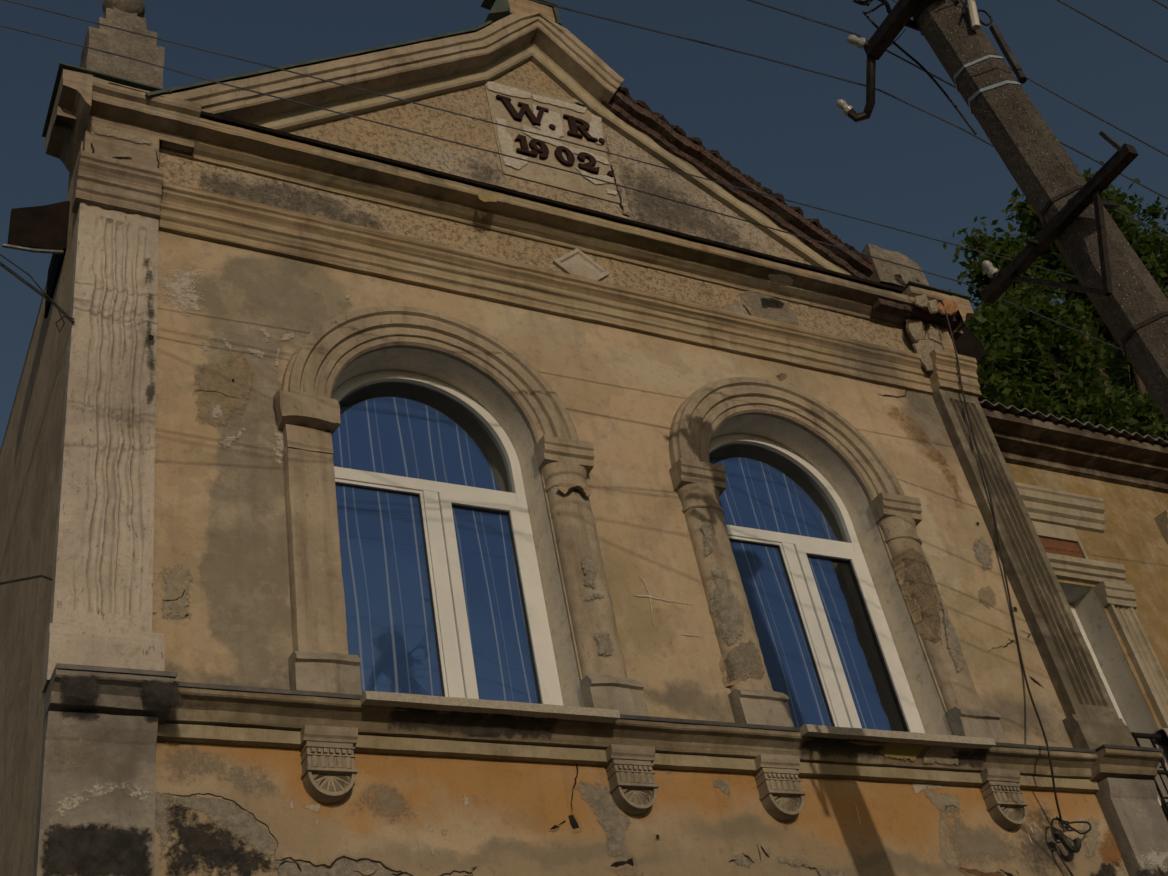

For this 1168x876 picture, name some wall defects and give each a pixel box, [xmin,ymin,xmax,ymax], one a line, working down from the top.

water stain [248,41,851,275]
flaking render [194,331,294,426]
flaking render [872,294,966,372]
flaking render [709,569,765,687]
flaking render [892,547,965,671]
flaking render [155,792,410,876]
crack [159,784,478,876]
crack [559,764,578,825]
spalling [564,812,583,835]
flaking render [575,781,643,876]
crack [778,855,848,876]
flaking render [912,783,1020,876]